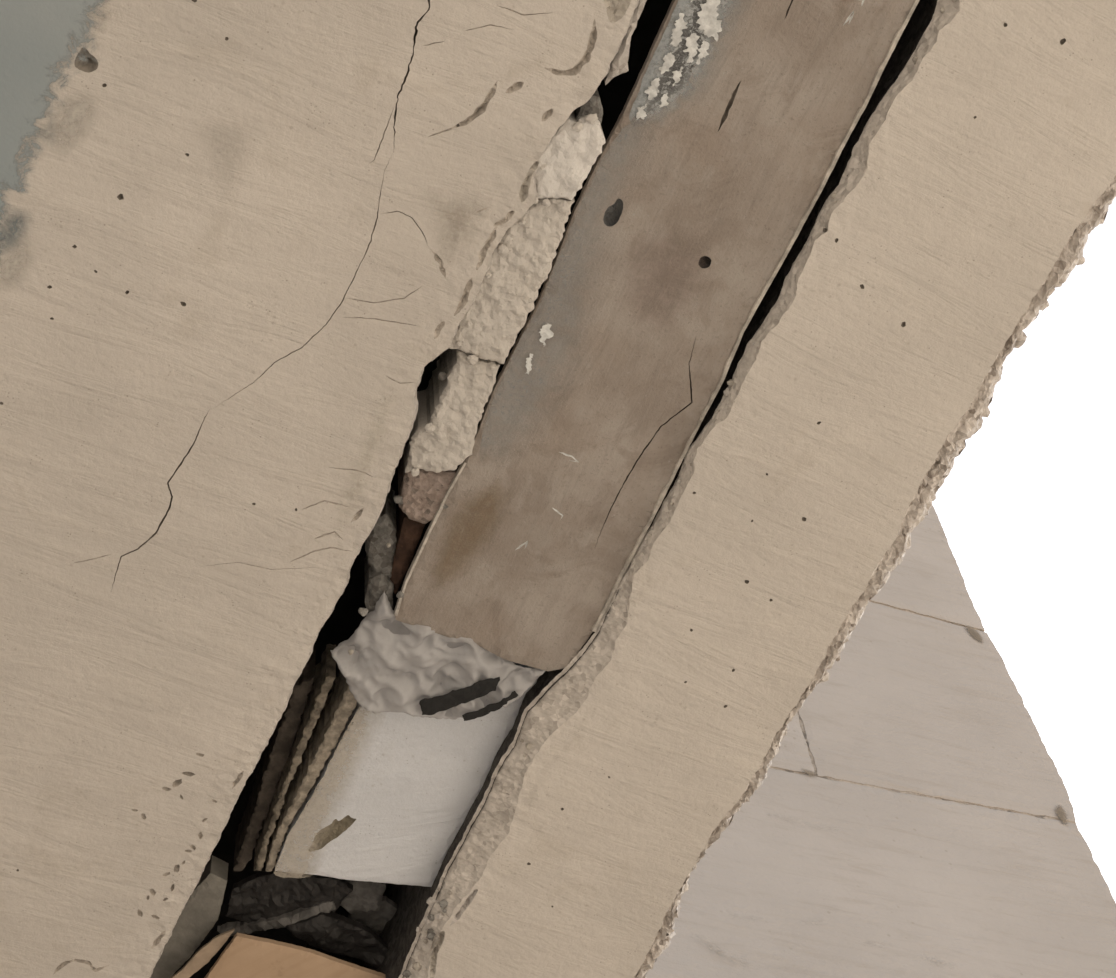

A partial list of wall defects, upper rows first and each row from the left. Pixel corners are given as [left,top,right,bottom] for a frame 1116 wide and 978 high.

crack [112,0,430,587]
spalling [137,368,424,978]
crack [595,339,696,547]
spalling [398,0,960,978]